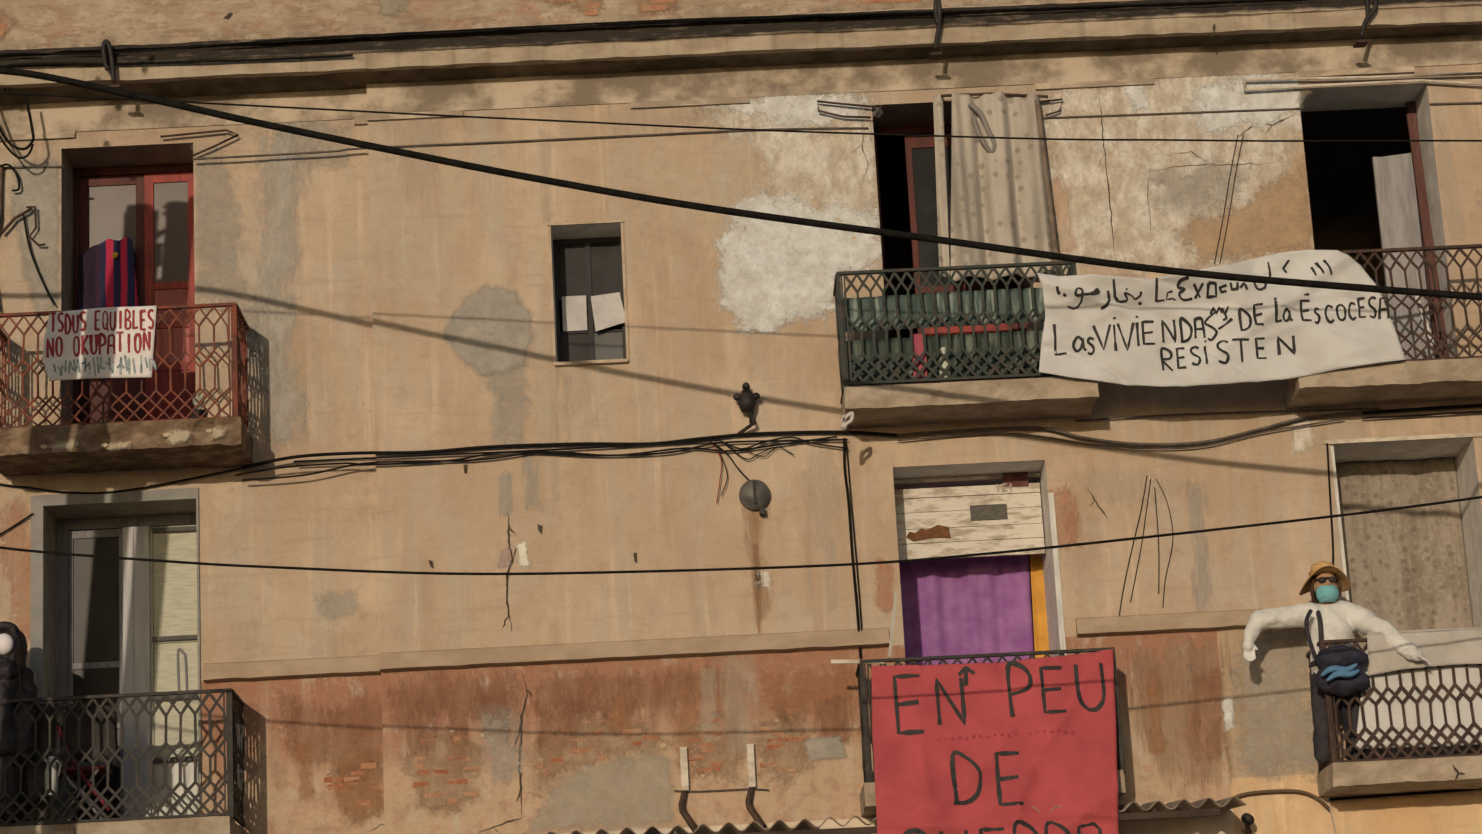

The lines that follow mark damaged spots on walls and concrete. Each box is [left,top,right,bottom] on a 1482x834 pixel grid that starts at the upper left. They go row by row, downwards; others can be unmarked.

peeling [703,93,882,333]
crack [503,510,517,631]
flaking render [324,757,383,824]
crack [478,674,532,834]
flaking render [404,712,812,812]